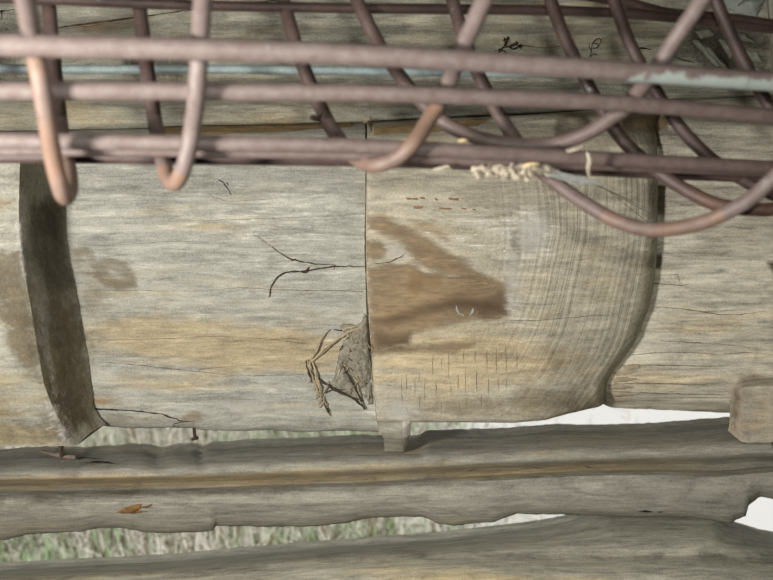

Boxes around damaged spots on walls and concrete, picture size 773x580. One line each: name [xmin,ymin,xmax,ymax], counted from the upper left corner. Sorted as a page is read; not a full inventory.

water stain [0,241,55,393]
crack [212,285,364,293]
water stain [366,217,517,354]
crack [93,398,192,428]